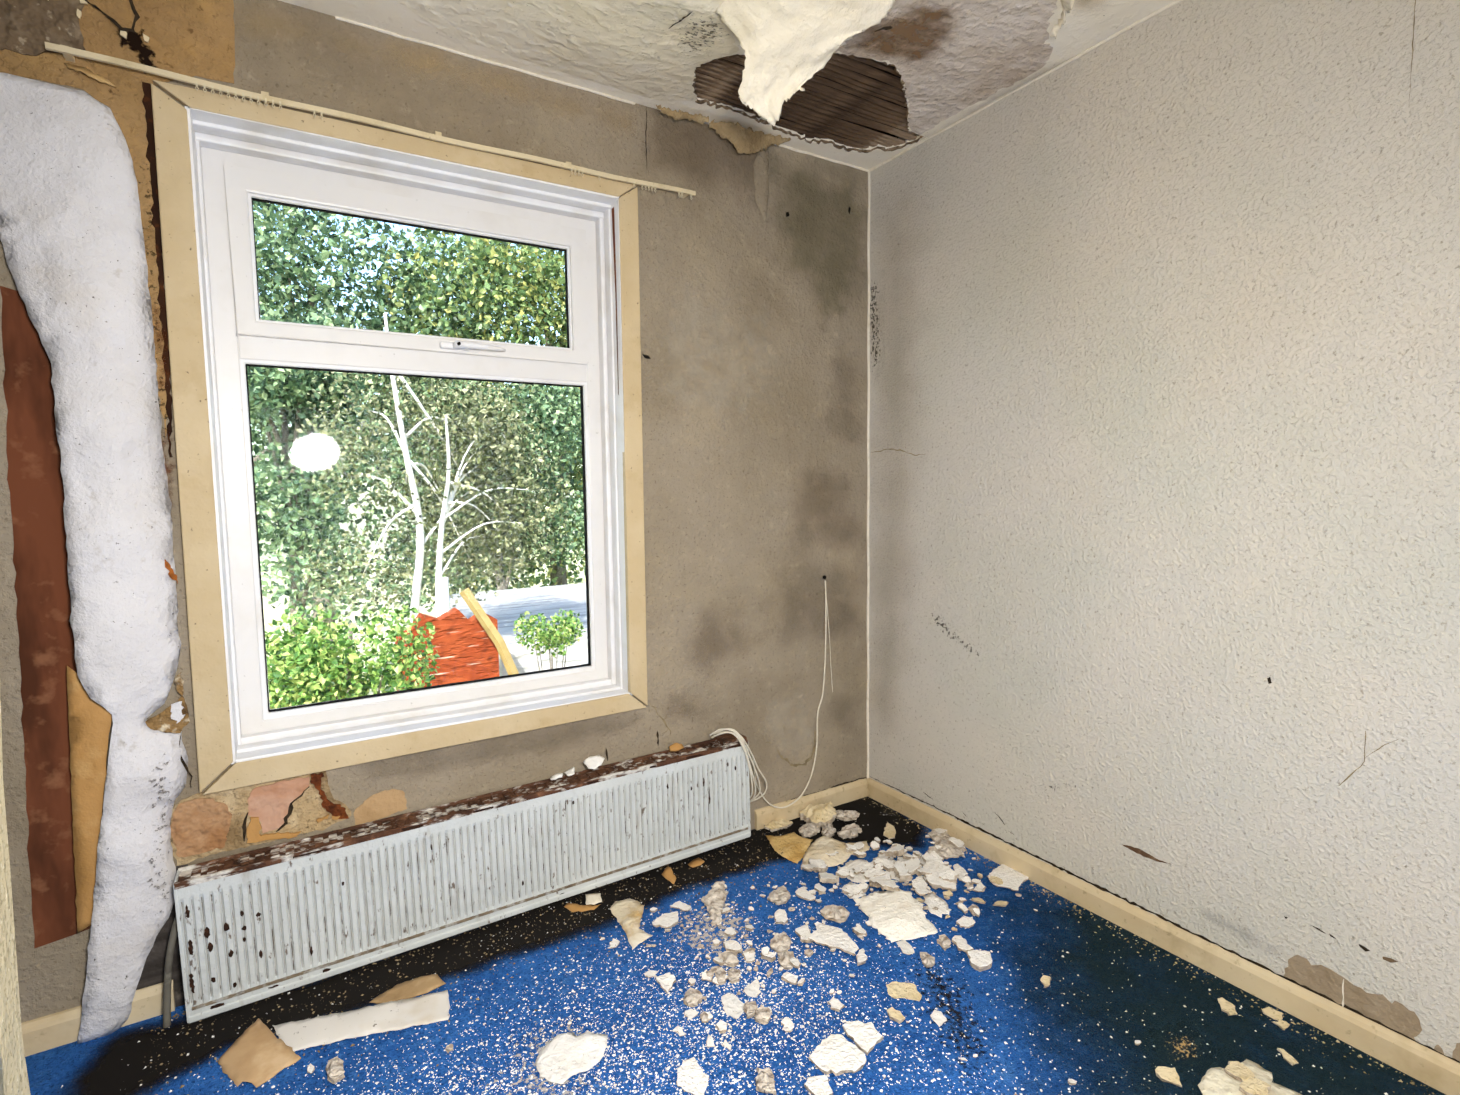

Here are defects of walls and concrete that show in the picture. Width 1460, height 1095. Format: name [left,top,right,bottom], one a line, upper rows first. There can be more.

crack [85,0,140,34]
leakage [859,8,949,60]
flaking render [835,0,1057,135]
crack [142,82,173,472]
flaking render [170,771,407,873]
flaking render [136,902,185,1007]
peeling [1284,954,1422,1041]
peeling [1434,1043,1460,1062]